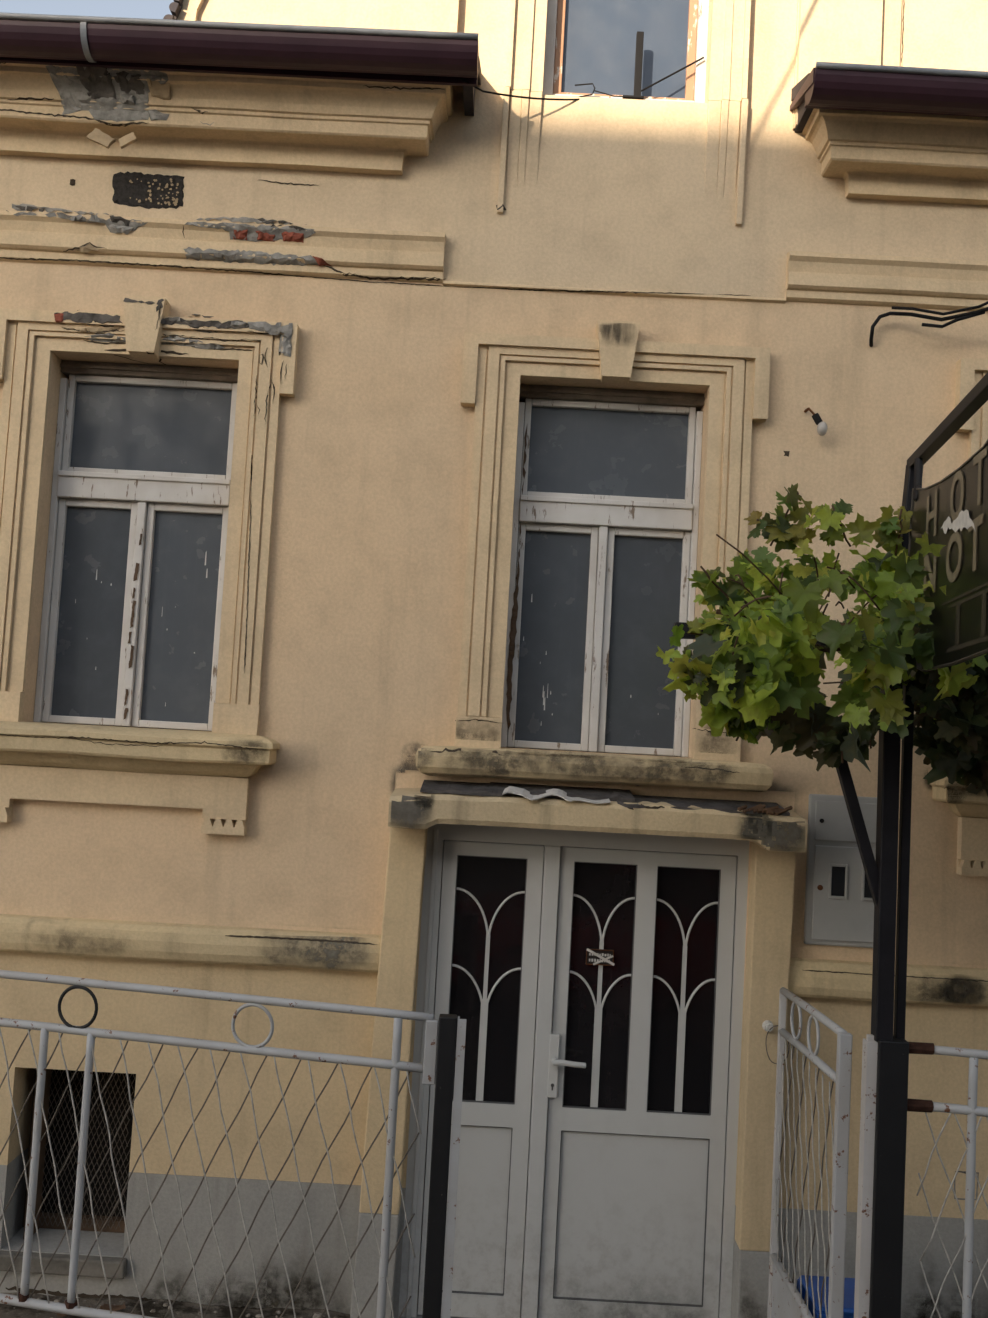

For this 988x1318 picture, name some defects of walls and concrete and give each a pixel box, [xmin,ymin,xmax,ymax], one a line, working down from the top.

spalling [0,65,171,149]
spalling [6,203,148,234]
spalling [54,298,293,357]
water stain [918,977,983,1003]